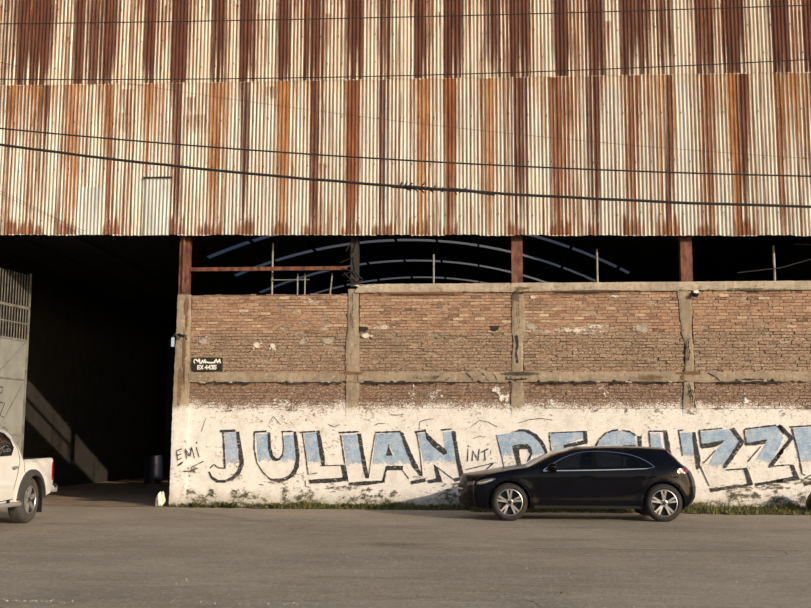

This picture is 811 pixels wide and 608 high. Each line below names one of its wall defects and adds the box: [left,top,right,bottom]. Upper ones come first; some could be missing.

corrosion [0,0,132,235]
corrosion [137,0,259,235]
corrosion [270,0,364,235]
corrosion [372,0,395,235]
corrosion [406,0,470,235]
corrosion [477,0,609,235]
corrosion [614,0,683,235]
corrosion [694,0,756,235]
corrosion [767,0,811,226]
spalling [363,380,455,399]
spalling [534,379,609,396]